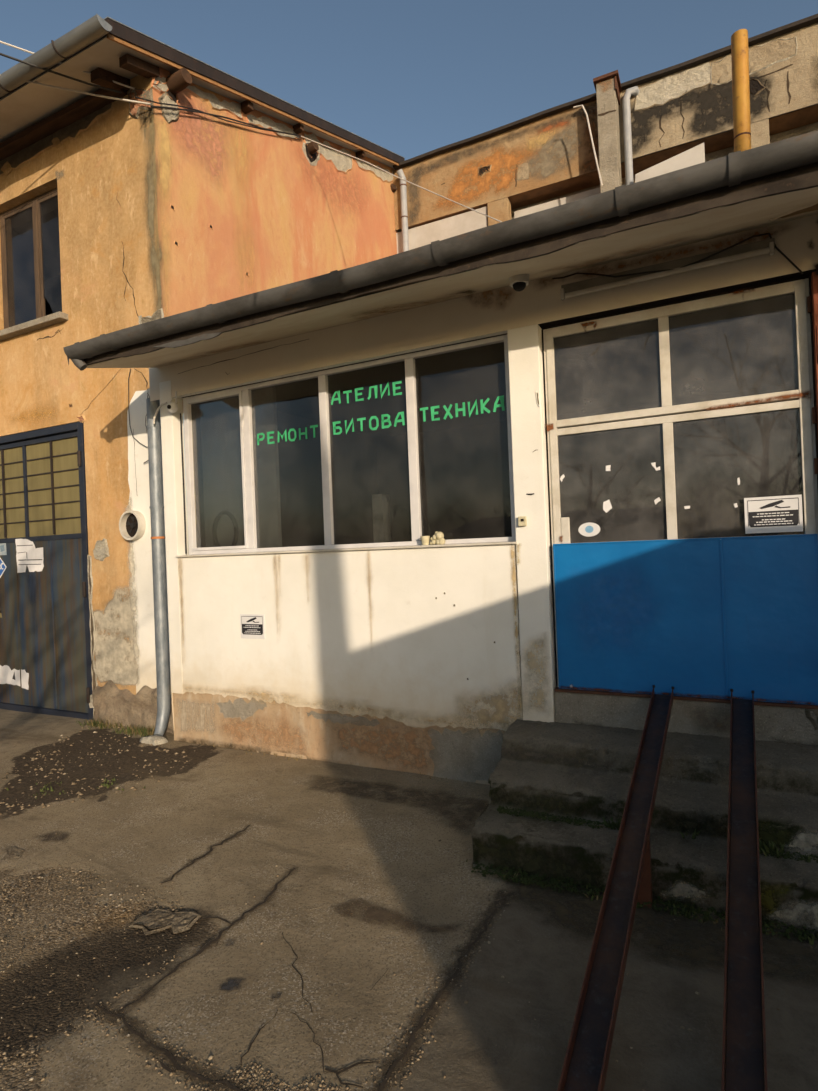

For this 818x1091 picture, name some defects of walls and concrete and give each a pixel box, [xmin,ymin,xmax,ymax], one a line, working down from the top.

peeling [216,697,268,722]
peeling [306,710,386,727]